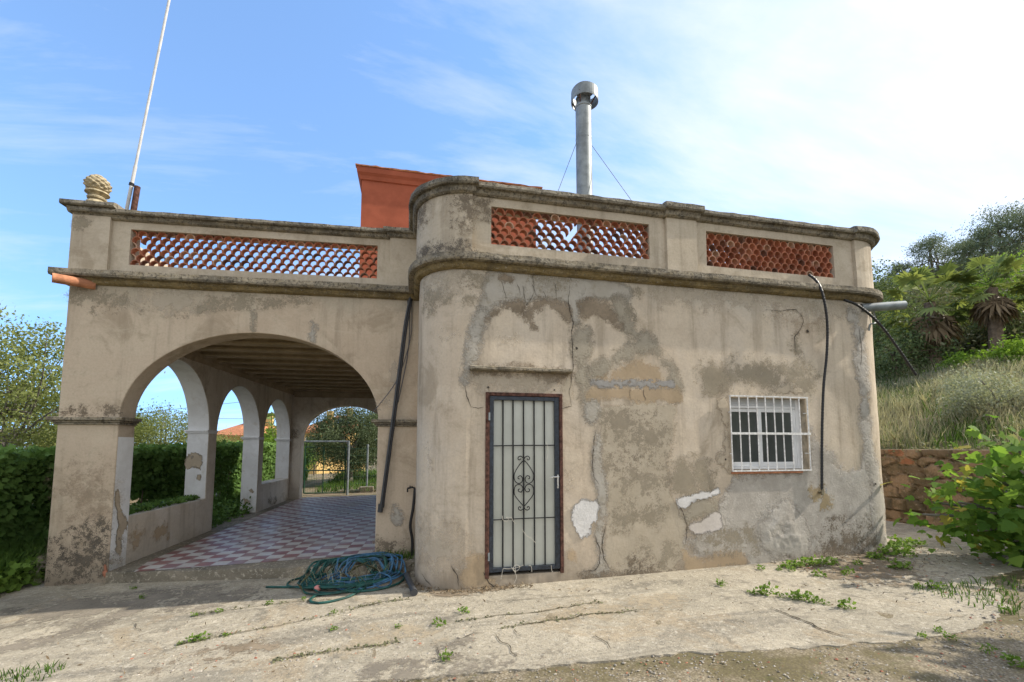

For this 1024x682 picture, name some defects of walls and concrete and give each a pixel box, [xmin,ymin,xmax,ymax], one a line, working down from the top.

crack [502,275,574,409]
spalling [562,377,573,406]
peeling [184,452,203,481]
peeling [114,489,129,556]
peeling [570,497,601,539]
crack [583,432,610,577]
peeling [676,488,721,509]
peeling [688,511,723,534]